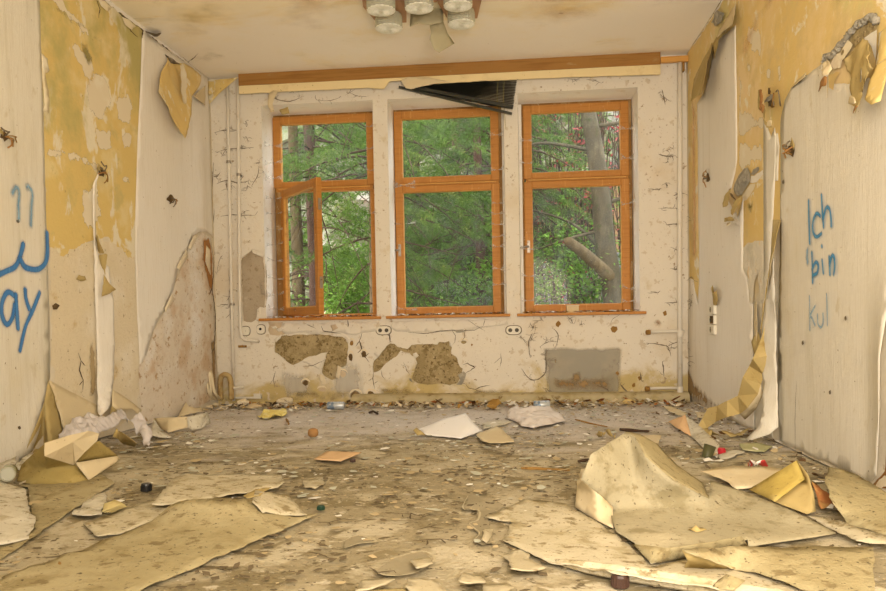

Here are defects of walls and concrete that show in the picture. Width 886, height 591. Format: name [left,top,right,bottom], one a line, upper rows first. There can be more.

peeling [40,0,222,432]
flaking render [241,249,508,392]
peeling [688,0,886,341]
peeling [873,463,886,488]